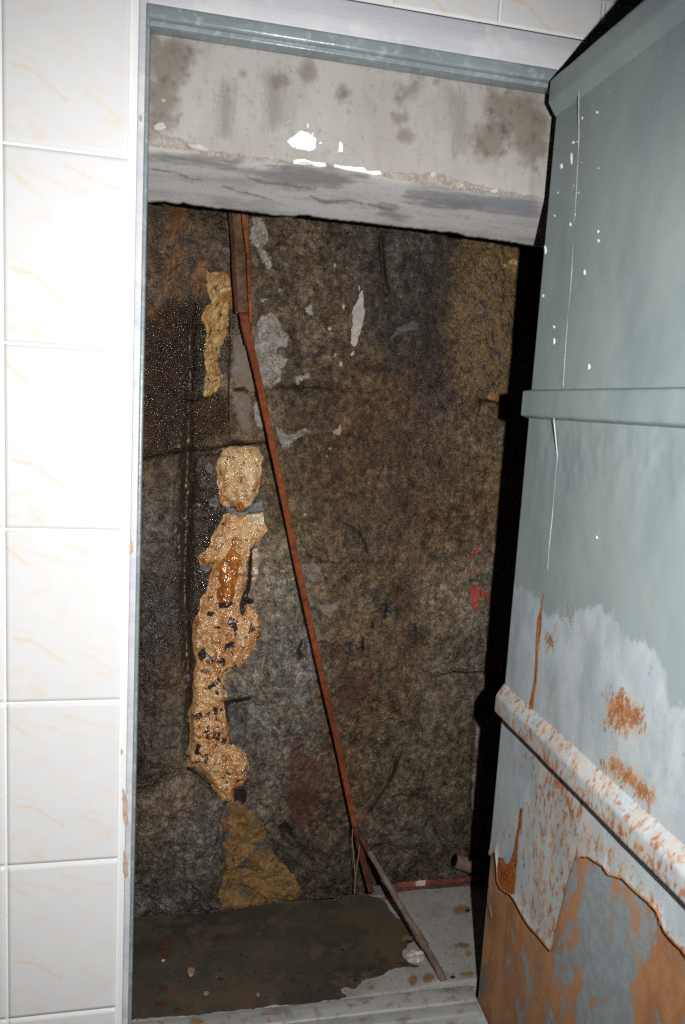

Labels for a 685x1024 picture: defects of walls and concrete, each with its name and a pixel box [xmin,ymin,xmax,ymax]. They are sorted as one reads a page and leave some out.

leakage [477,95,544,158]
leakage [132,271,419,1020]
rust [528,594,554,709]
rust [601,687,642,738]